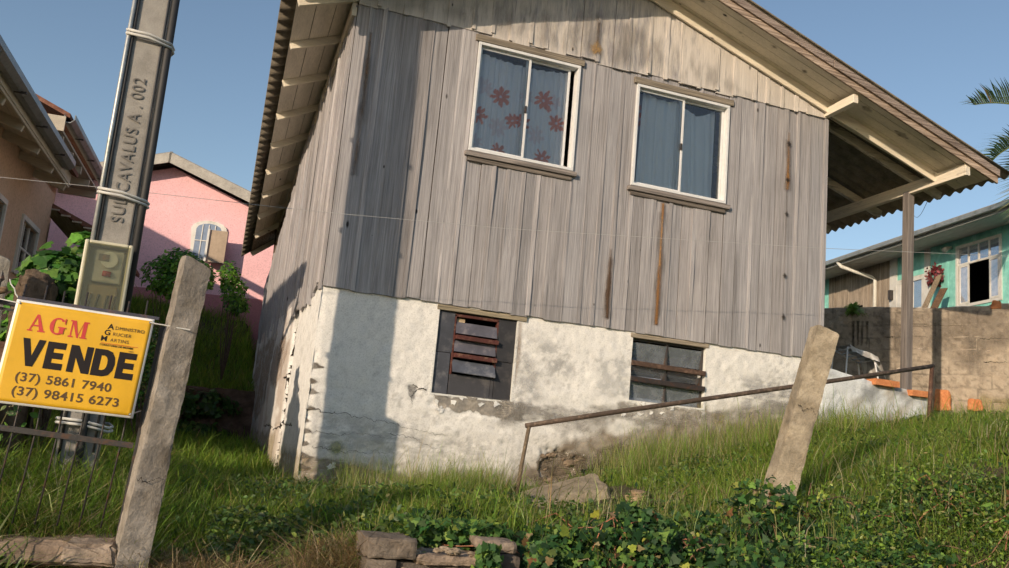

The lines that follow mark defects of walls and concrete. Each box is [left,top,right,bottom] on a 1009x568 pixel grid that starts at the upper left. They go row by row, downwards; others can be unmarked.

crack [263,324,437,465]
spalling [434,395,523,422]